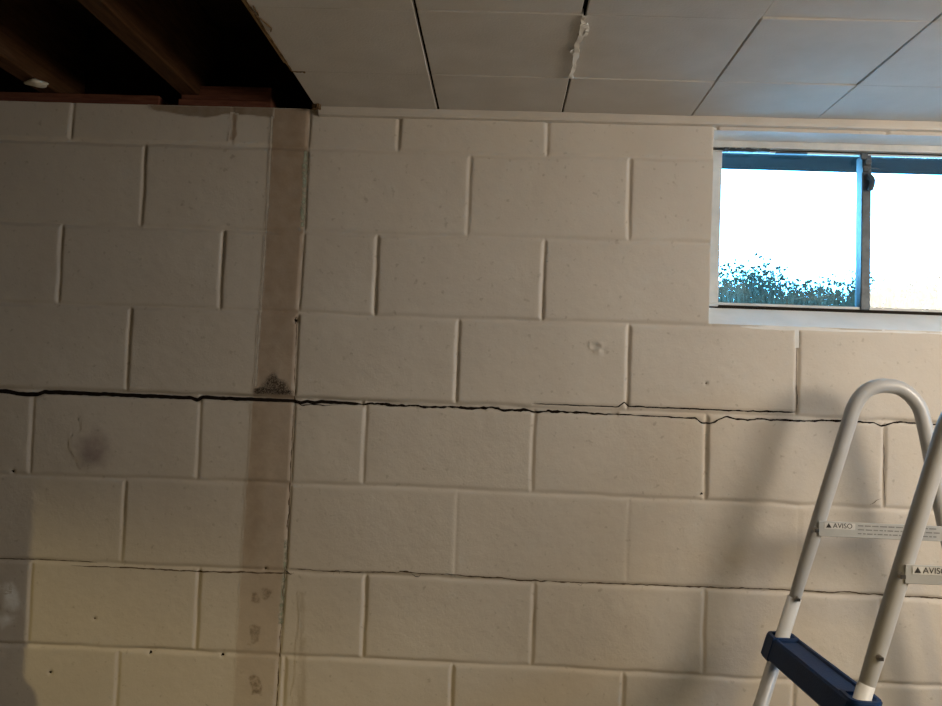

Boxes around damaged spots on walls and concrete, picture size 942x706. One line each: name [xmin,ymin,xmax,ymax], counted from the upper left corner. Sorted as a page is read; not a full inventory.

peeling [568,16,589,79]
leakage [255,374,290,394]
crack [0,318,942,706]